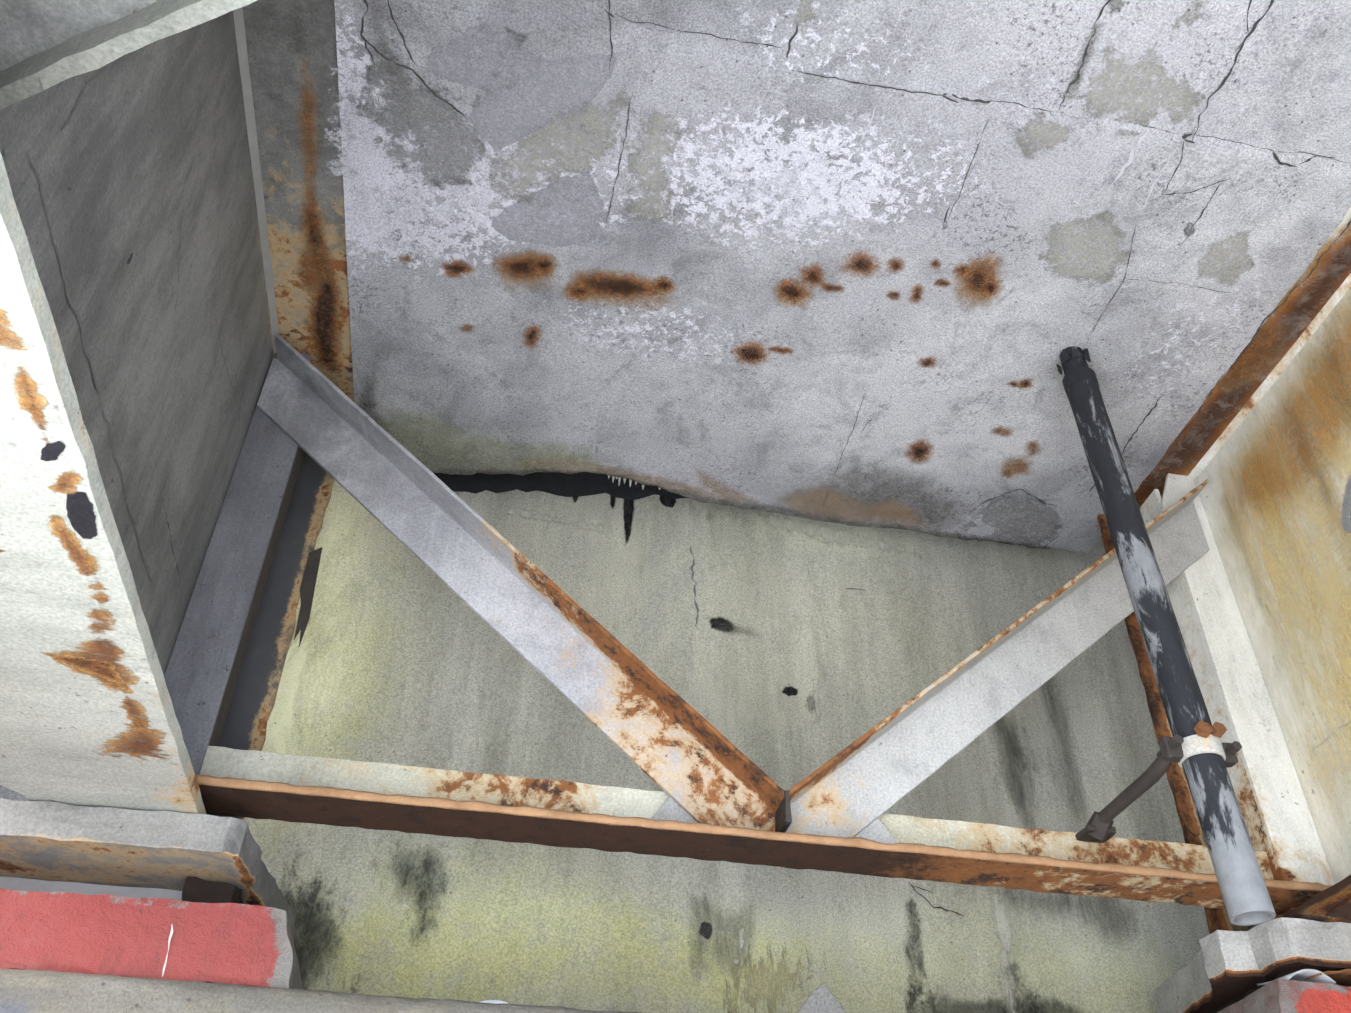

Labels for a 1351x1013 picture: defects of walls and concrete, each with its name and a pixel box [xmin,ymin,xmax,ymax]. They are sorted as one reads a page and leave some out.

crack [360,0,467,119]
crack [605,0,1123,224]
crack [1085,0,1351,346]
corrosion [567,272,674,300]
corrosion [14,367,48,443]
crack [1122,396,1162,454]
corrosion [1134,223,1351,506]
crack [1135,220,1351,497]
leakage [510,471,755,543]
leakage [766,471,1019,550]
corrosion [43,550,168,760]
corrosion [195,774,1218,883]